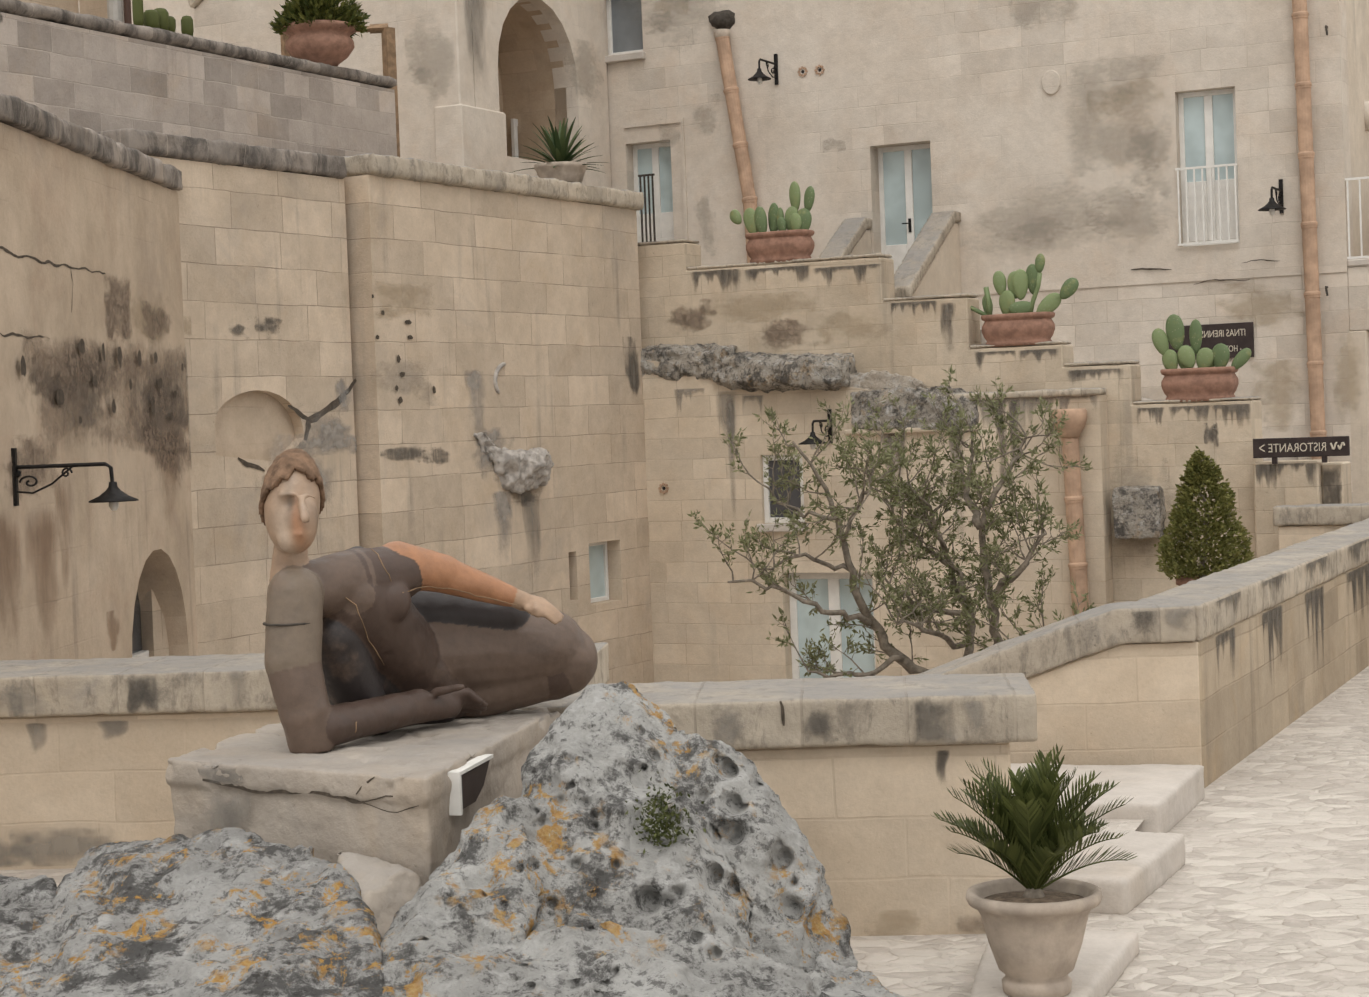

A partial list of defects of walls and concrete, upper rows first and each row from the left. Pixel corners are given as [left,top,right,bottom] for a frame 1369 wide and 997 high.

crack [0,246,105,312]
damp [693,264,878,285]
damp [892,301,953,329]
crack [0,331,50,339]
damp [977,349,1056,365]
damp [1070,369,1120,379]
crack [288,378,357,441]
crack [238,457,265,472]
damp [1349,539,1369,607]
damp [1306,556,1327,645]
damp [1216,628,1235,654]
damp [1263,606,1282,650]